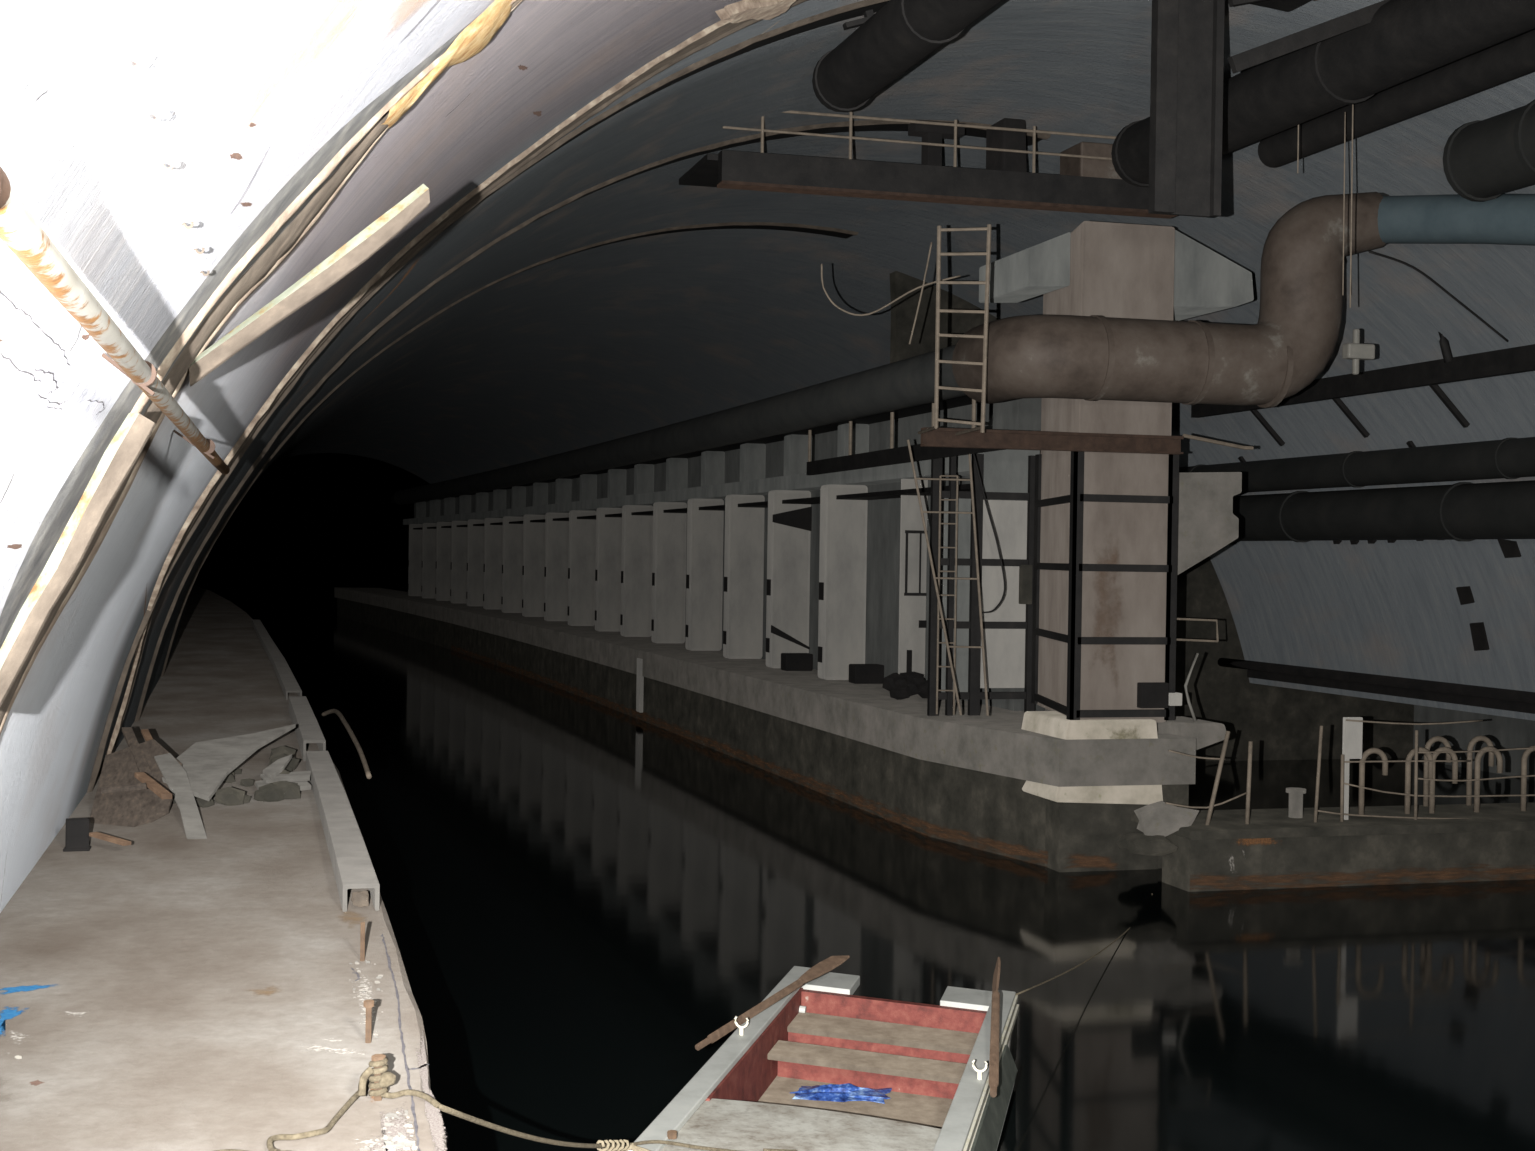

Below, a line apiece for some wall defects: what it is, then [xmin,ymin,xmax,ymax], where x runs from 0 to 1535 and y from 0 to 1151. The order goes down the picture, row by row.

crack [0,291,105,415]
spalling [370,1031,447,1151]